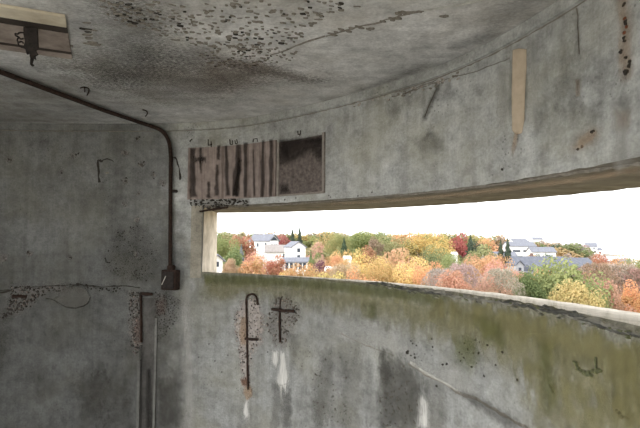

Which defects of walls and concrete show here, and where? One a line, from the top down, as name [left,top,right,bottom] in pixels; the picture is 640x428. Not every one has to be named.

peeling [99,0,344,67]
corrosion [618,17,632,76]
spalling [2,283,121,318]
spalling [128,292,180,353]
spalling [233,293,300,394]
leakage [272,351,288,397]